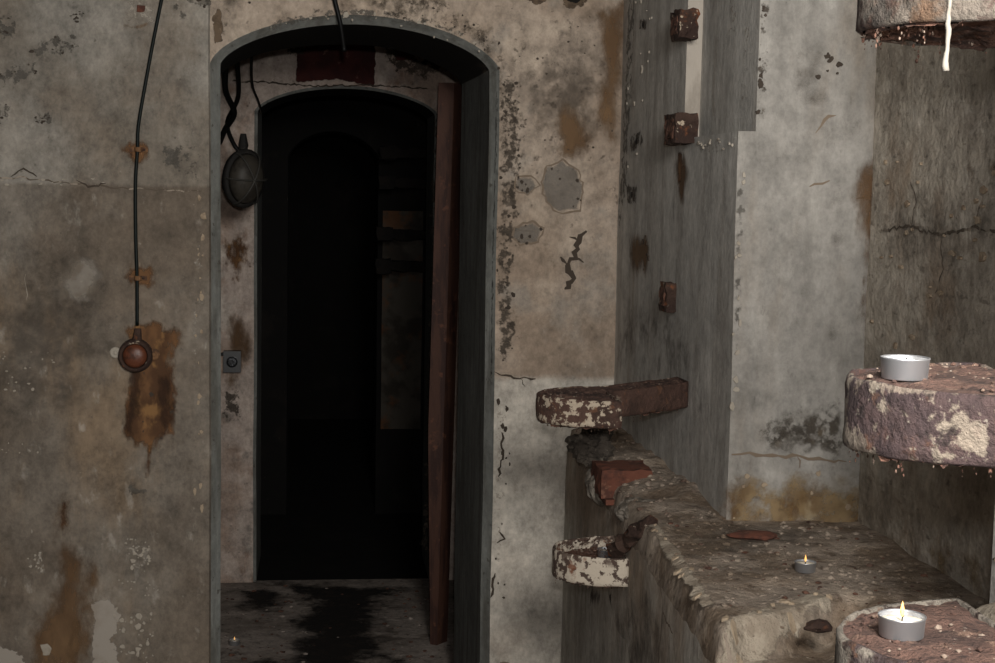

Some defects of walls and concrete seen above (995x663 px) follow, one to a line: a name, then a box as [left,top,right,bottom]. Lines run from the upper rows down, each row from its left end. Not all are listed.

damp [594,3,624,138]
corrosion [861,21,945,63]
damp [545,71,594,156]
flaking render [491,80,584,366]
crack [560,231,587,290]
crack [881,181,995,293]
corrosion [124,321,181,475]
damp [730,474,859,542]
peeling [0,646,25,663]
peeling [91,599,154,663]